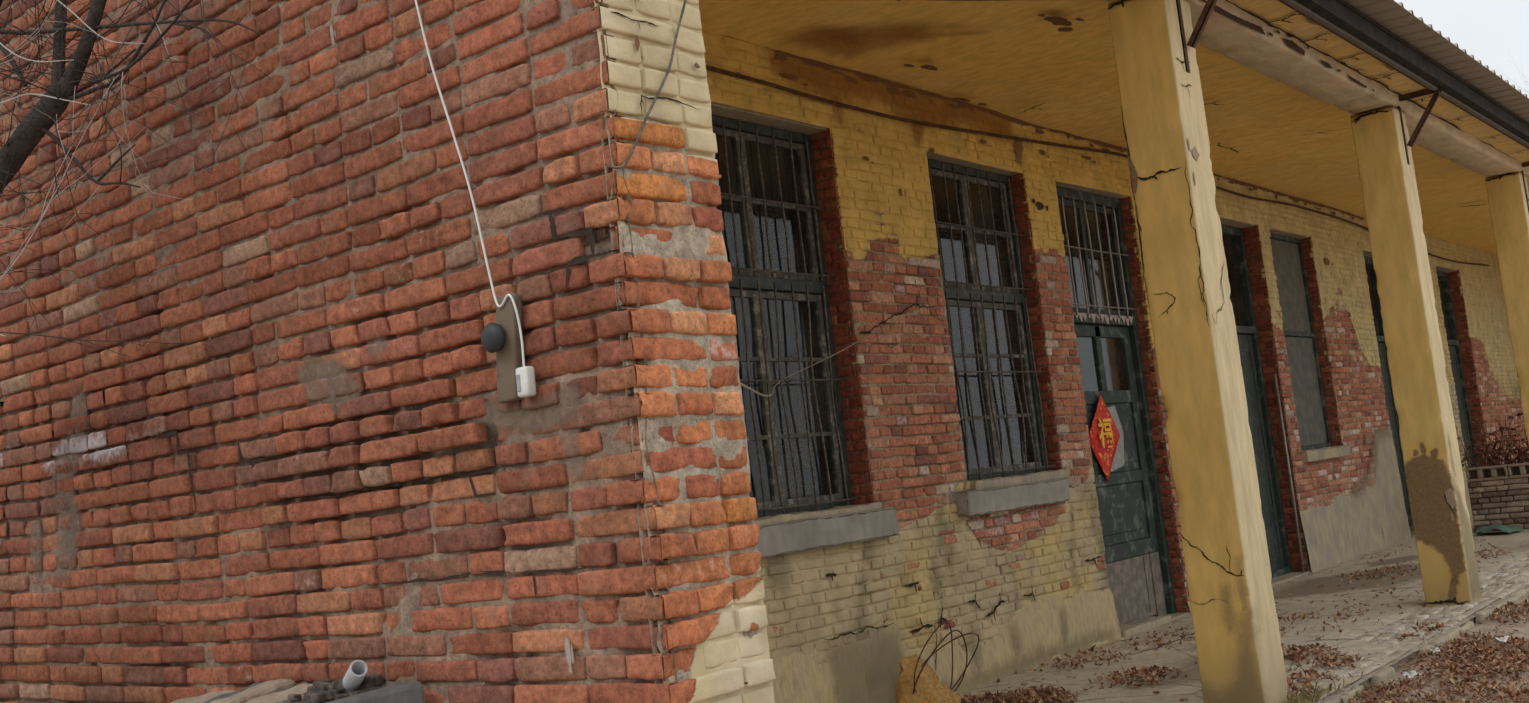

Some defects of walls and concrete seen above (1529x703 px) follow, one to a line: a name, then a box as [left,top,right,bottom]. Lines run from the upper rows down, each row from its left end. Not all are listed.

crack [1121,108,1225,324]
peeling [844,212,967,528]
peeling [939,248,1093,569]
peeling [1271,288,1390,511]
crack [1054,534,1244,667]